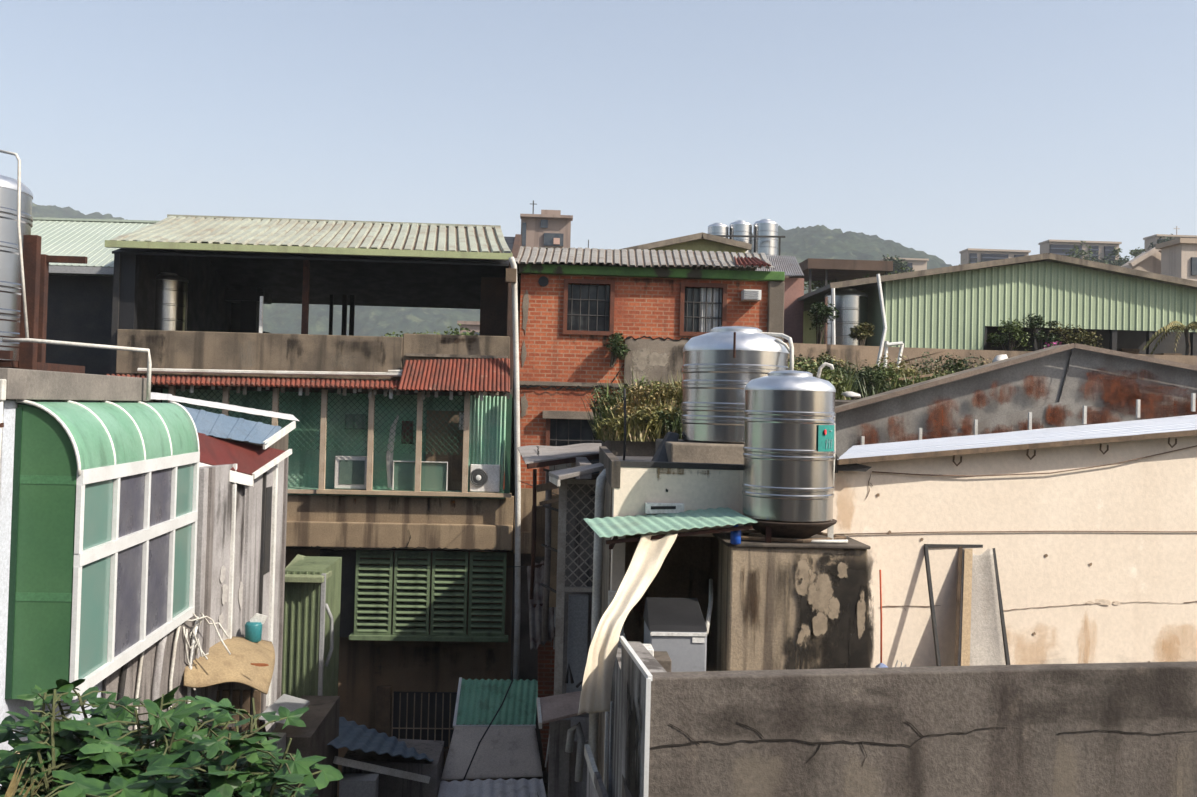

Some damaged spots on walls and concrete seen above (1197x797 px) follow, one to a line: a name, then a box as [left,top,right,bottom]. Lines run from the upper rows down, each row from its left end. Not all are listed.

rust [860,376,1197,445]
peeling [795,558,848,647]
peeling [857,590,866,639]
crack [649,721,997,767]
crack [1058,728,1197,736]